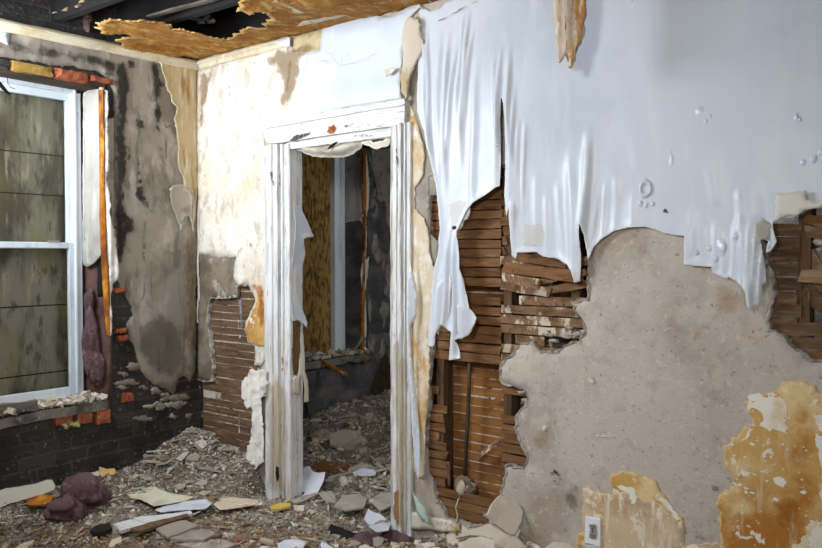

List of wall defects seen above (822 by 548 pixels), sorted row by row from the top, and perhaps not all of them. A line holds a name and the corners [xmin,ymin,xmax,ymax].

damp [0,33,243,421]
peeling [159,29,322,455]
flaking render [400,16,592,528]
peeling [577,380,822,548]
flaking render [761,190,822,363]